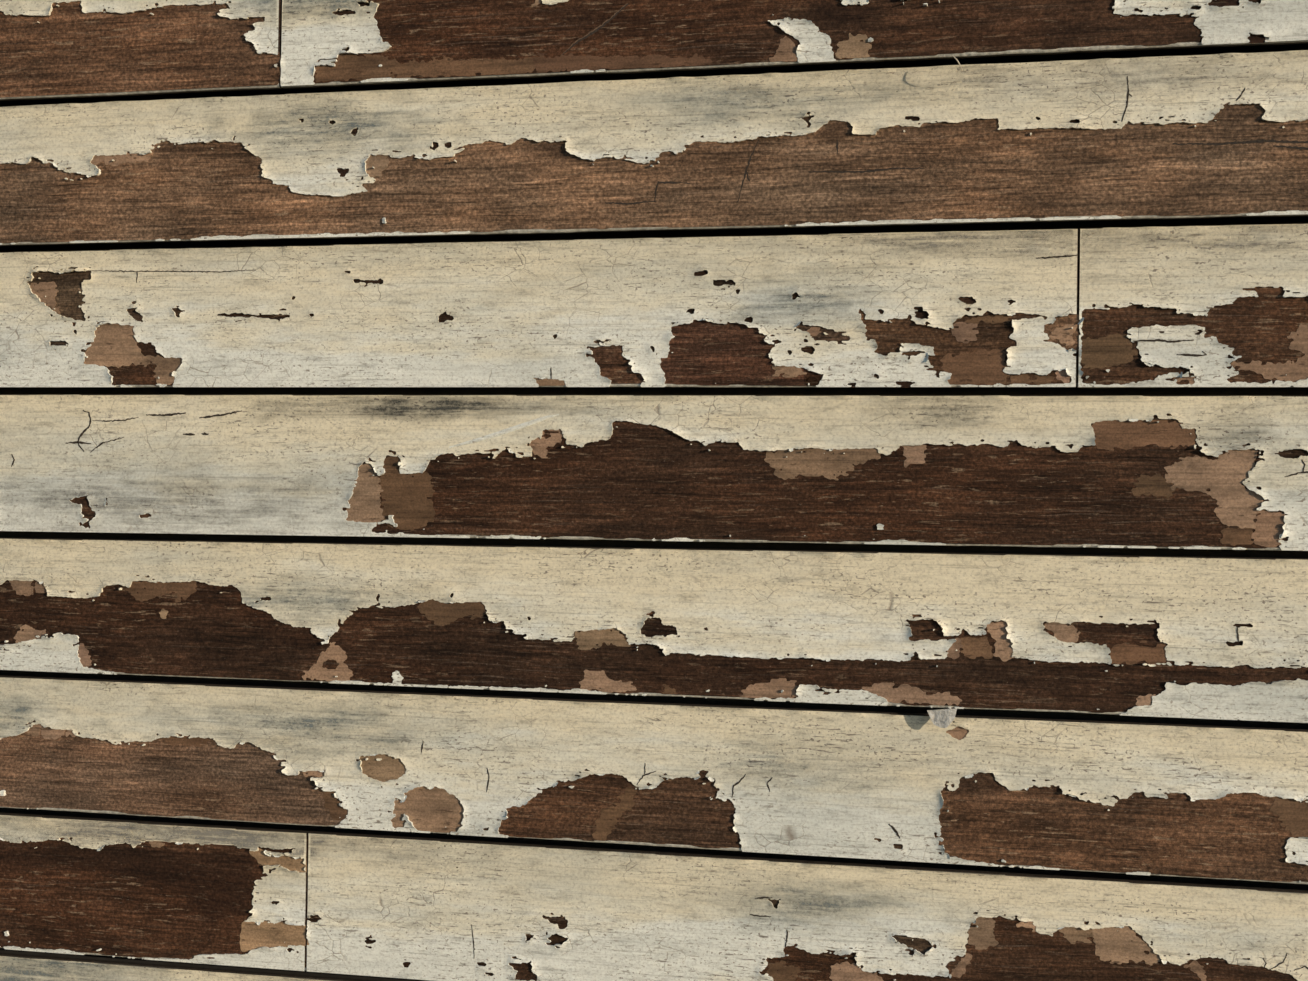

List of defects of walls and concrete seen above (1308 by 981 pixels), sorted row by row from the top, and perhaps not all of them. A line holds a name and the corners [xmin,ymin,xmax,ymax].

peeling [0,1,281,97]
peeling [313,0,1261,83]
peeling [0,102,1308,243]
peeling [27,271,182,386]
peeling [650,286,1308,386]
peeling [346,415,1308,548]
peeling [0,579,1308,740]
peeling [0,724,348,826]
peeling [483,770,742,848]
peeling [938,772,1308,882]
peeling [0,837,321,960]
peeling [760,915,1297,981]